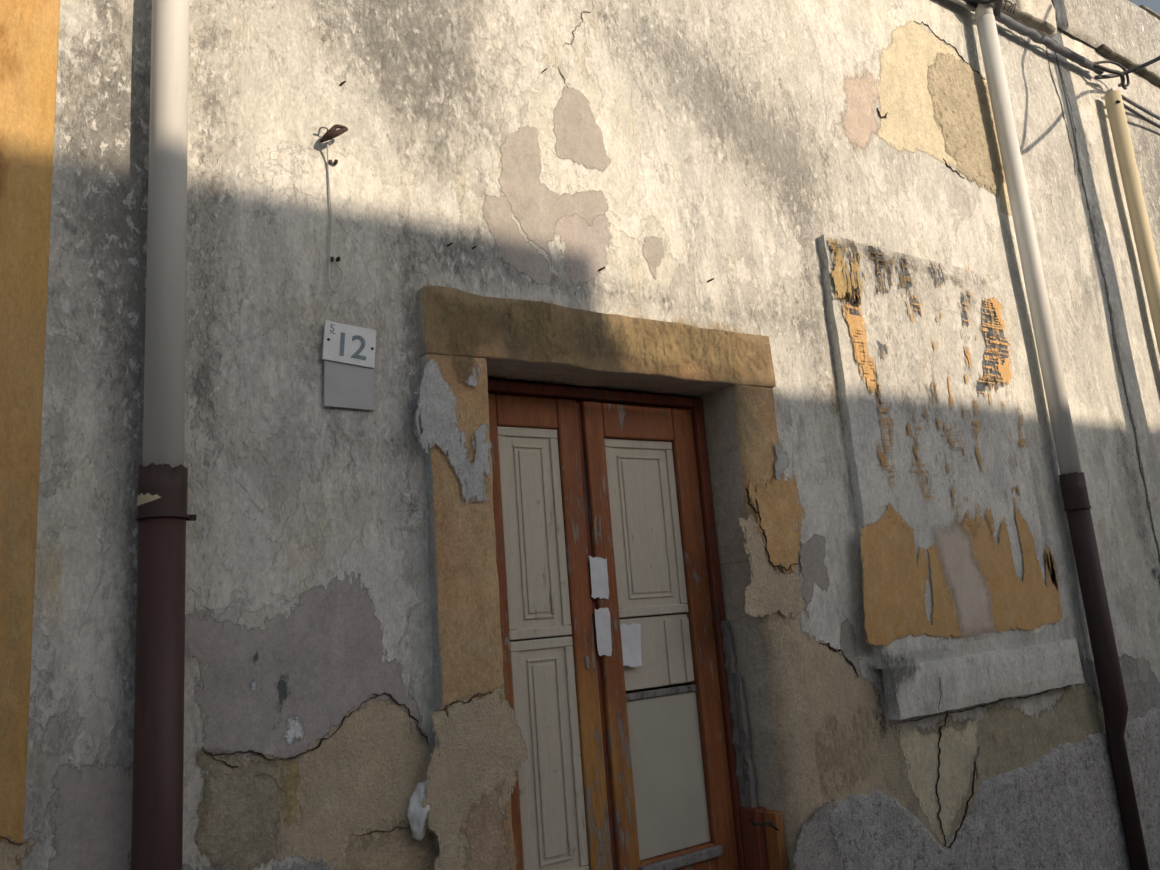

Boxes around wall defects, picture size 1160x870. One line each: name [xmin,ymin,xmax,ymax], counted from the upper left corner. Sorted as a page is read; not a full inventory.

peeling [483,126,612,286]
crack [558,0,594,87]
peeling [553,86,611,171]
spalling [842,21,1012,216]
crack [1046,47,1160,562]
peeling [415,357,491,504]
peeling [720,238,1105,870]
spalling [0,836,35,870]
peeling [46,760,133,870]
crack [202,692,491,789]
spalling [185,573,528,870]
crack [893,677,1082,849]